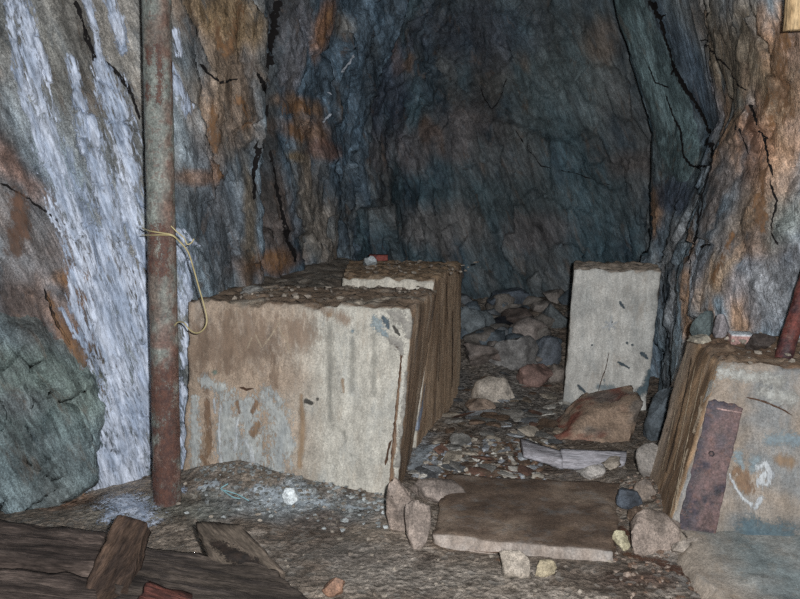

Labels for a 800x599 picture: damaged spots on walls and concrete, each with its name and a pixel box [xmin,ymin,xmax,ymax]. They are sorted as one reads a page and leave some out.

rust [144,43,164,105]
rust [146,220,174,281]
rust [775,276,800,359]
damp [178,311,315,469]
rust [149,361,181,508]
damp [249,483,334,509]